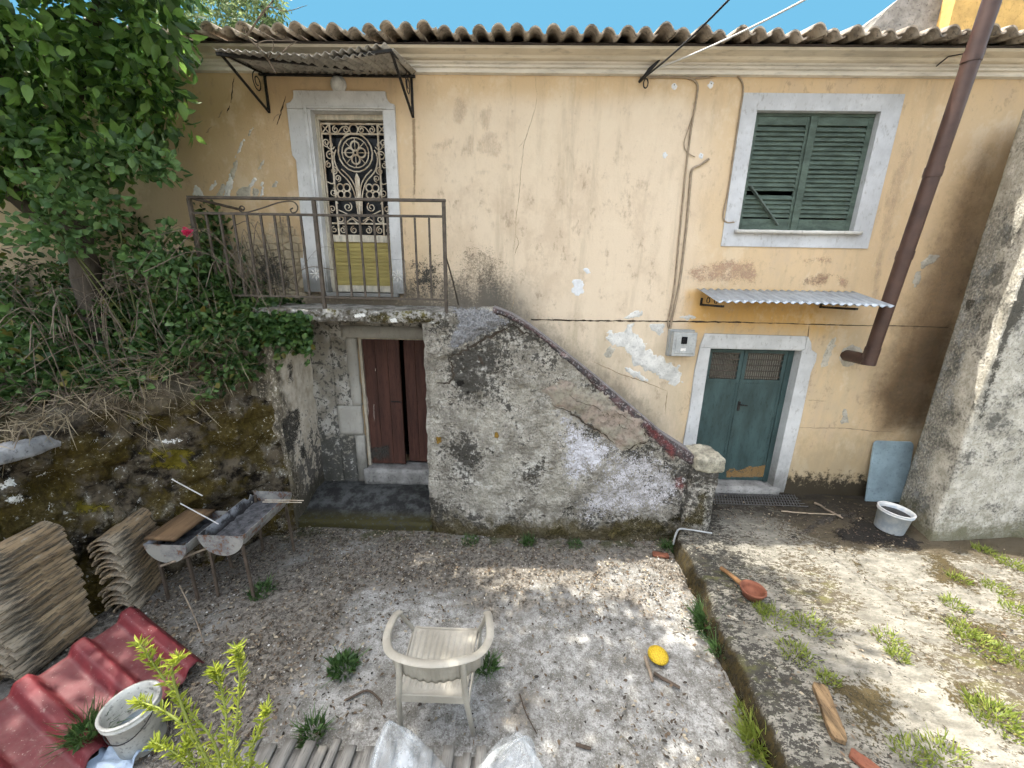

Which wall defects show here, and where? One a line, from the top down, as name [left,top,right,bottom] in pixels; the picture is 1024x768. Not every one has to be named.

peeling [192,127,278,196]
peeling [571,268,591,296]
peeling [604,310,683,386]
peeling [553,410,686,524]